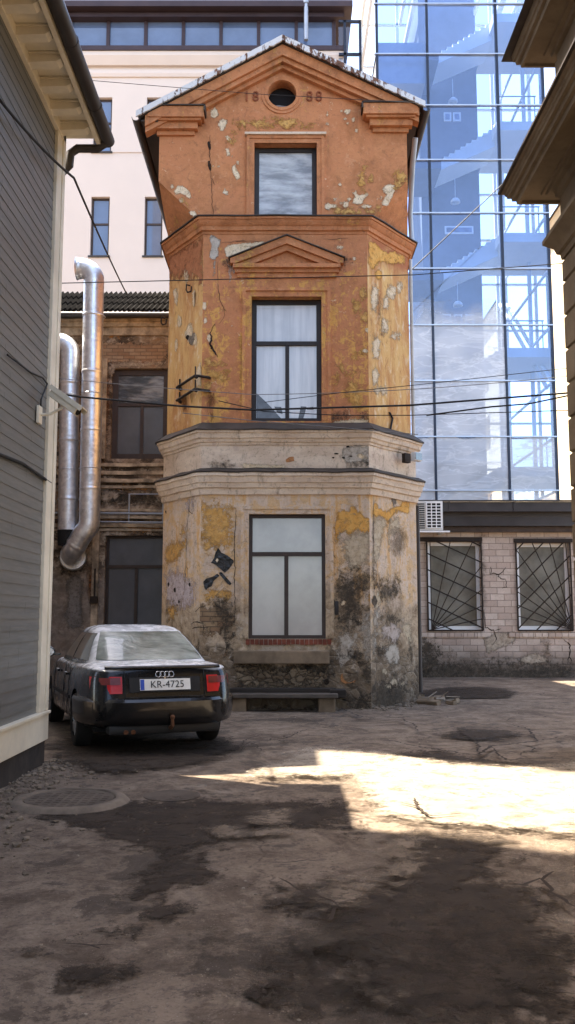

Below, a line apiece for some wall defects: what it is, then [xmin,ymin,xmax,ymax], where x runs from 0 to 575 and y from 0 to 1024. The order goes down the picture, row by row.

peeling [170,185,200,216]
peeling [325,159,408,215]
flaking render [103,235,264,376]
crack [209,242,225,357]
peeling [338,241,406,396]
spalling [332,445,369,464]
peeling [164,497,237,639]
leakage [214,593,407,709]
leakage [334,566,401,634]
peeling [334,499,409,572]